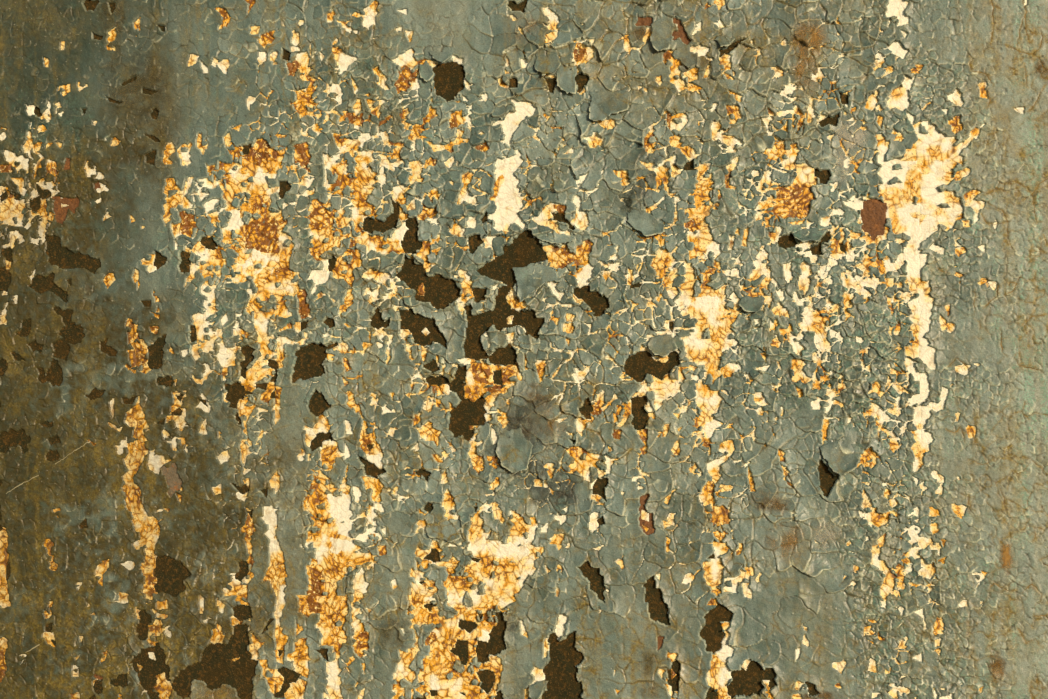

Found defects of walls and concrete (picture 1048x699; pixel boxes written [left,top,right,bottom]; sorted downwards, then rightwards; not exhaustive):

peeling [84,0,117,51]
peeling [327,0,379,39]
peeling [508,0,528,35]
peeling [543,7,562,48]
peeling [873,0,909,79]
peeling [0,82,117,386]
crack [974,279,1027,308]
peeling [0,505,11,608]
peeling [95,559,109,586]
corrosion [1001,546,1011,567]
peeling [43,601,56,647]
peeling [0,637,8,682]